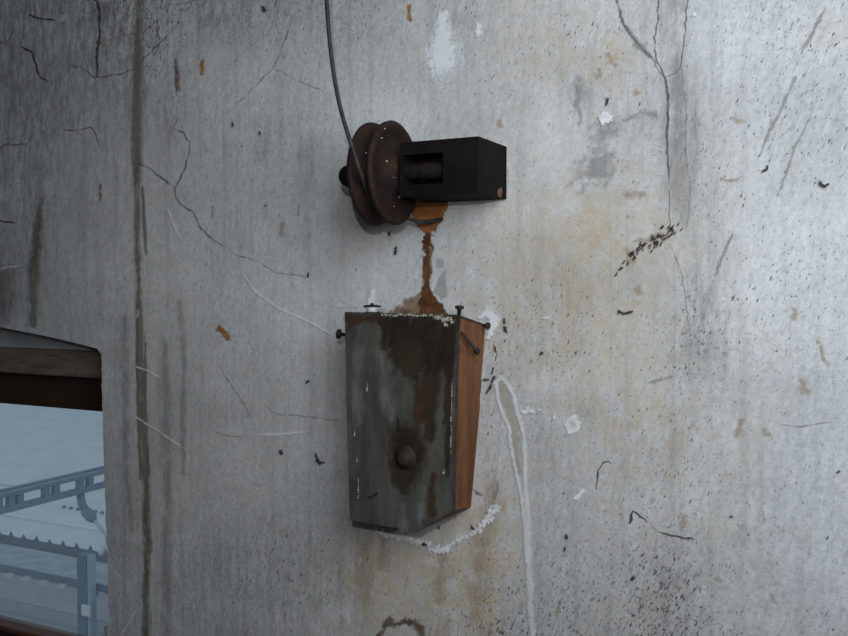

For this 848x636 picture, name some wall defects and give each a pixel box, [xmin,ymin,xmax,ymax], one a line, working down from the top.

crack [0,0,55,82]
crack [616,0,688,224]
crack [133,121,224,246]
rust [390,201,448,315]
spalling [614,223,683,276]
water stain [132,2,152,636]
crack [629,511,694,540]
water stain [376,617,425,636]